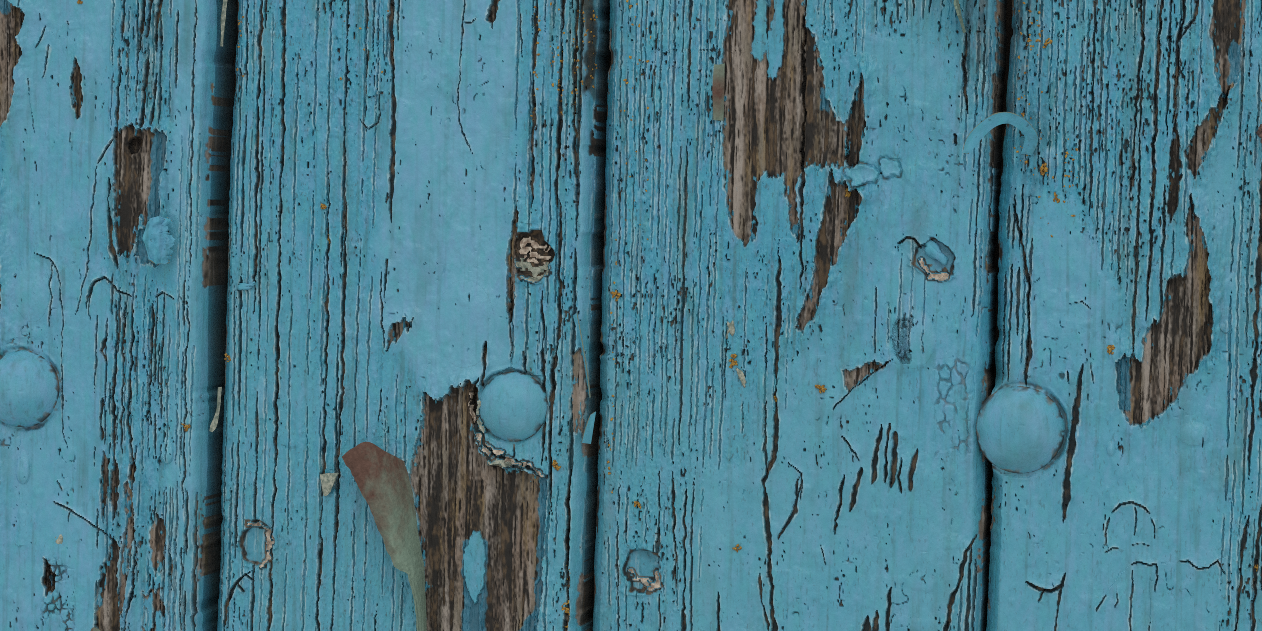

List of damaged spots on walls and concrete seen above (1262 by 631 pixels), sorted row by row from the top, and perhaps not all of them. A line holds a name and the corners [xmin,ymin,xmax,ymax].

peeling [0,0,25,127]
peeling [1210,0,1245,100]
peeling [114,125,176,266]
peeling [712,0,900,331]
crack [1130,0,1199,308]
crack [1015,208,1032,383]
peeling [1116,195,1214,427]
crack [1248,168,1262,472]
peeling [320,380,548,631]
crack [944,540,974,631]
crack [1062,365,1093,518]
crack [1187,508,1262,631]